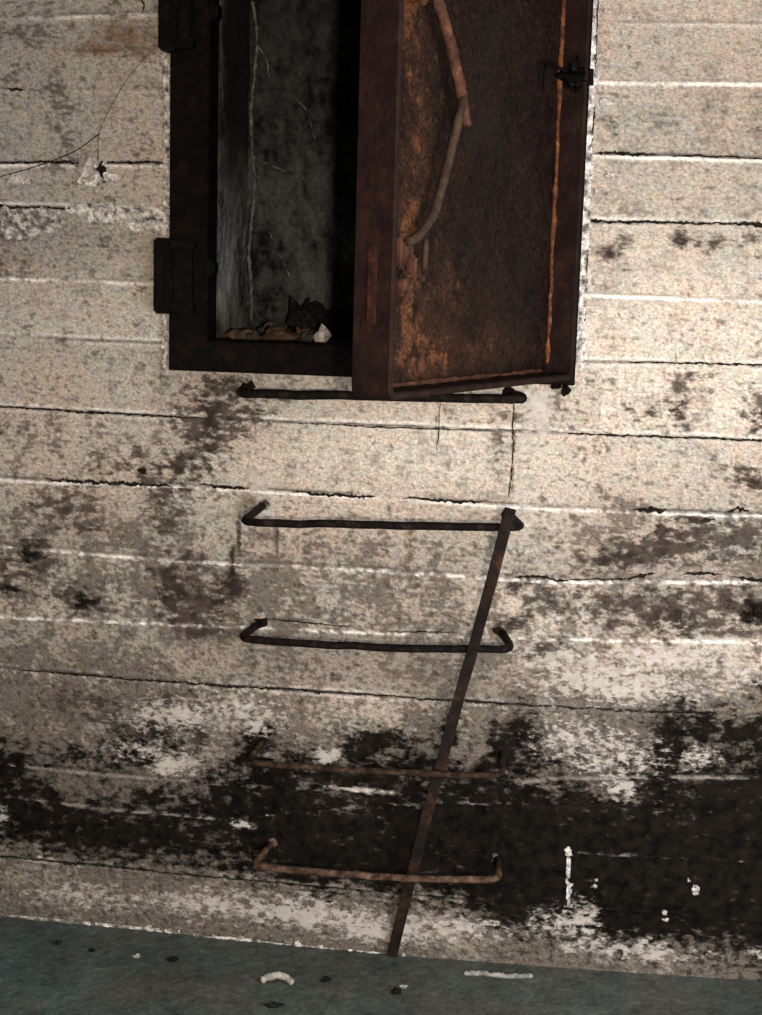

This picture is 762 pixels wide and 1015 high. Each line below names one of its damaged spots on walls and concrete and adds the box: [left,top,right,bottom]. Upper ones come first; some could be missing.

water stain [625,368,705,431]
water stain [76,375,286,536]
water stain [721,464,762,489]
water stain [0,485,115,616]
water stain [146,549,238,639]
rust [221,515,248,599]
rust [497,614,535,634]
rust [505,577,531,594]
water stain [576,513,762,574]
rust [236,721,278,763]
rust [481,706,531,777]
water stain [0,583,762,981]